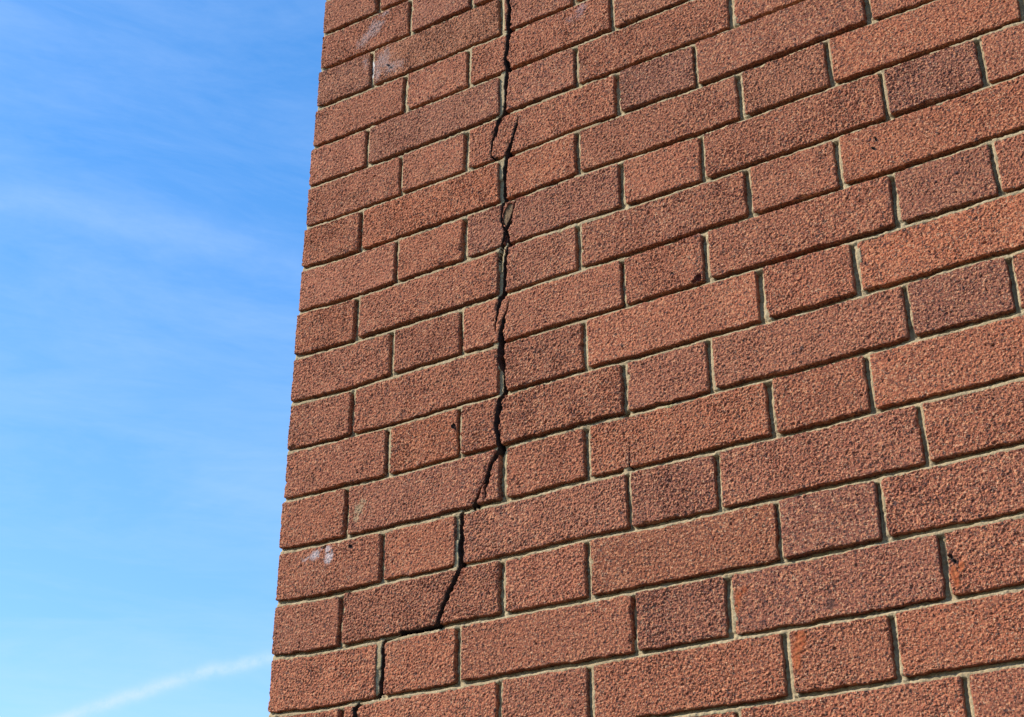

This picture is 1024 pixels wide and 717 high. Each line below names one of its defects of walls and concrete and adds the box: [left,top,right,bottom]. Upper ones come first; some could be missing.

crack [352,0,519,717]